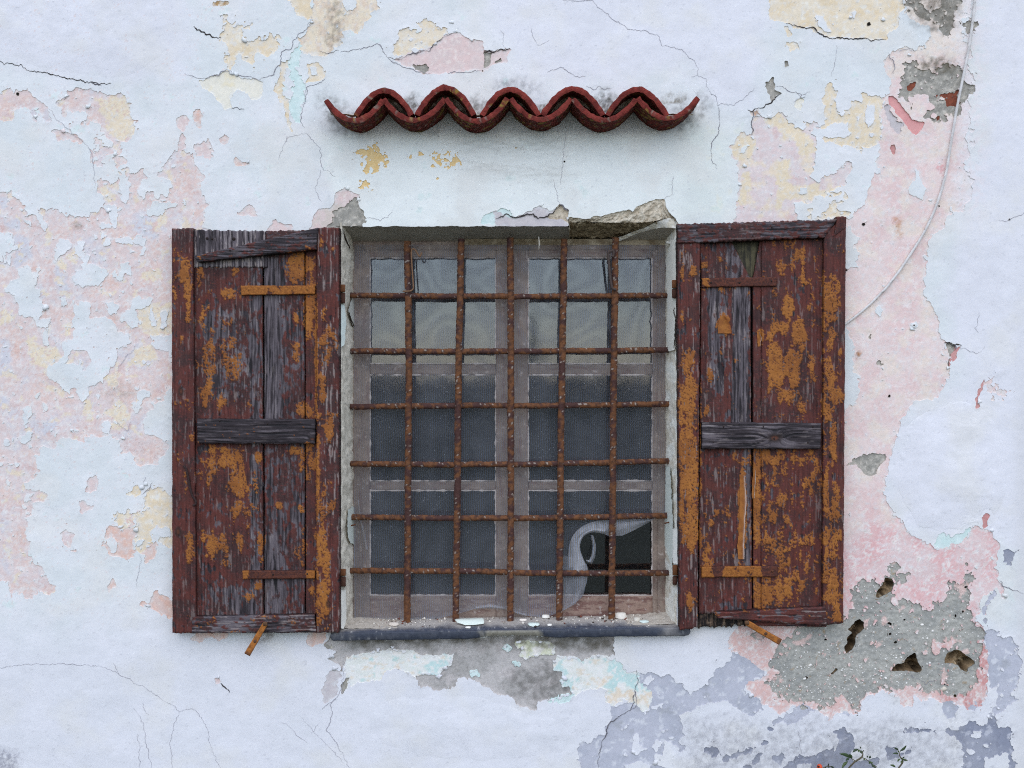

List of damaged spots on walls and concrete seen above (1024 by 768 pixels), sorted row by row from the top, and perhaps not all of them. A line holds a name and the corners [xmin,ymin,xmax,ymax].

crack [1,61,109,85]
crack [564,0,805,163]
peeling [0,87,229,599]
peeling [306,0,1023,768]
crack [4,663,217,768]
crack [284,667,349,767]